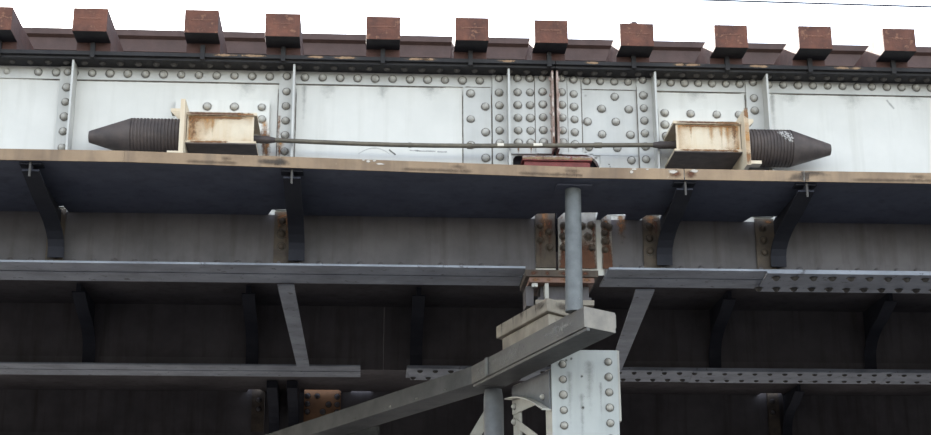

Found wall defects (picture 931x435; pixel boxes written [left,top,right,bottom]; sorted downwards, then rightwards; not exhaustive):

corrosion [582,216,625,282]